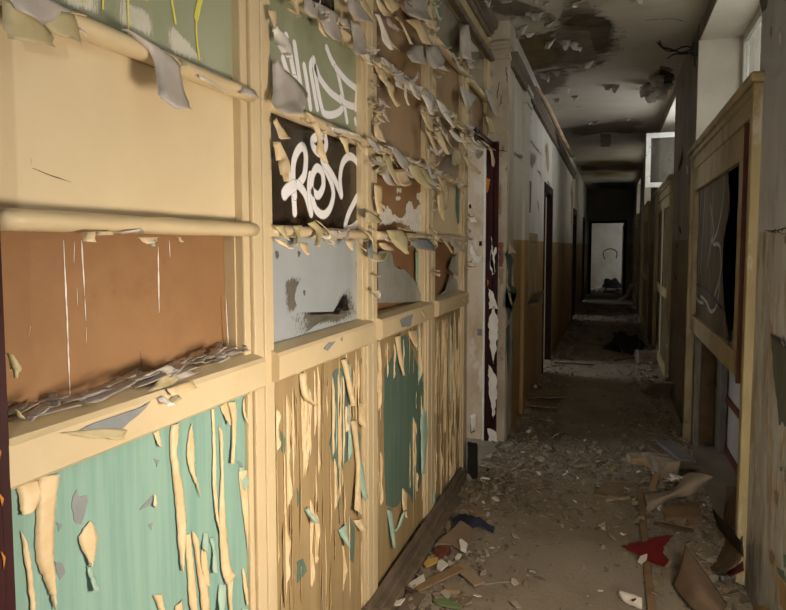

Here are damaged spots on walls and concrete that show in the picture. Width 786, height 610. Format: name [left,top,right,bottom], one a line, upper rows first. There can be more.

peeling [122,29,192,110]
water stain [491,0,627,95]
peeling [82,228,158,246]
peeling [268,0,517,417]
crack [764,227,786,254]
peeling [65,381,197,440]
peeling [377,310,476,548]
peeling [770,334,786,427]
peeling [16,474,60,610]
peeling [78,521,100,591]
peeling [152,397,256,610]
peeling [276,351,368,610]